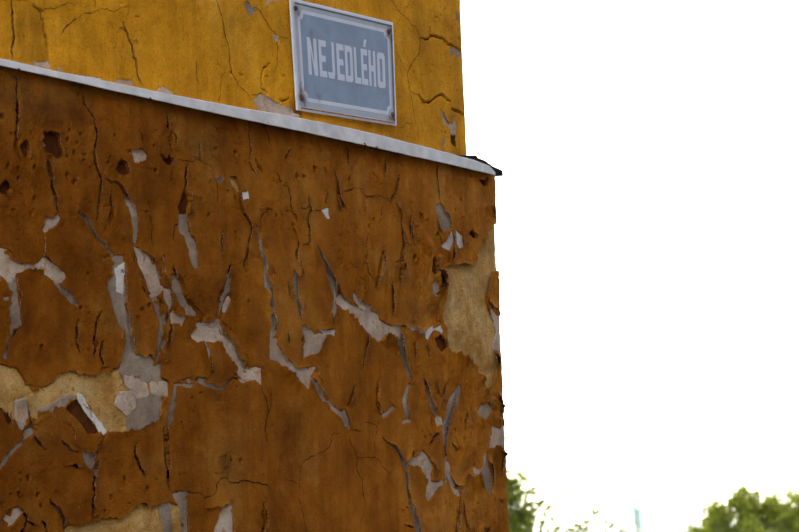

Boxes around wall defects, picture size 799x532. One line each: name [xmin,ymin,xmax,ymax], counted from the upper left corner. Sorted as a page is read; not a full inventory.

crack [10,0,144,158]
spalling [116,141,149,176]
peeling [253,91,294,123]
crack [391,0,461,133]
peeling [441,107,457,151]
peeling [0,191,261,476]
crack [83,91,272,442]
crack [257,151,354,359]
peeling [256,203,508,532]
crack [382,216,491,532]
peeling [63,491,239,532]
crack [134,428,275,532]